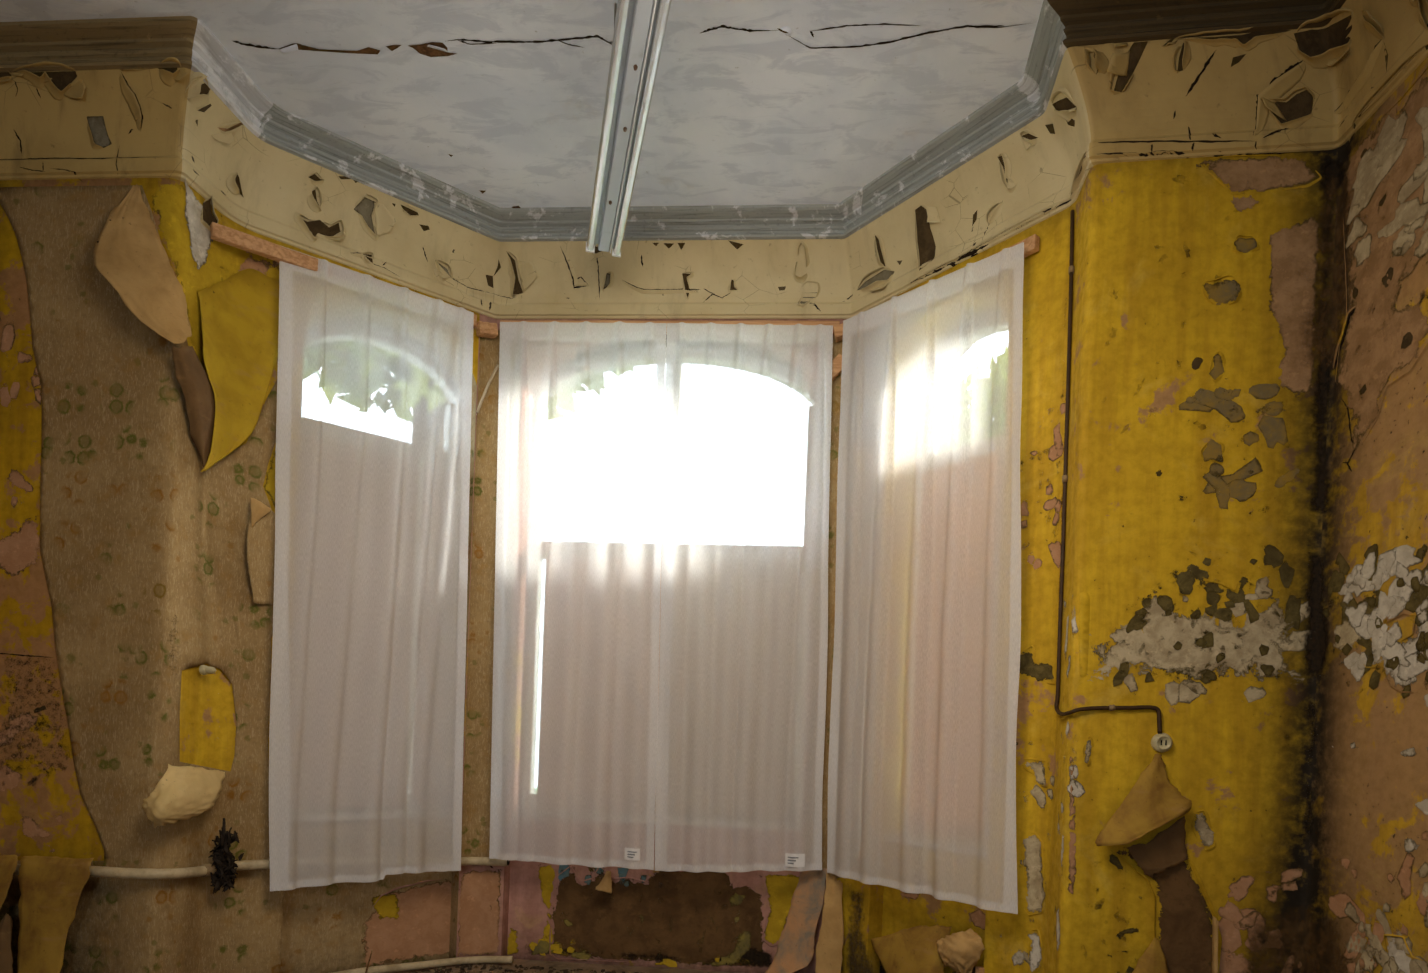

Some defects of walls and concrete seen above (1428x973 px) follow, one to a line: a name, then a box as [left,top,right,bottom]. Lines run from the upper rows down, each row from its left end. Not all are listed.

crack [448,35,612,48]
crack [701,23,1030,49]
spalling [152,173,279,375]
peeling [294,171,430,264]
peeling [858,205,941,292]
spalling [1078,7,1428,452]
spalling [1177,217,1320,514]
spalling [1019,531,1428,707]
mould [1304,554,1328,676]
spalling [361,865,799,968]
spalling [1108,847,1303,973]
spalling [1328,799,1428,973]